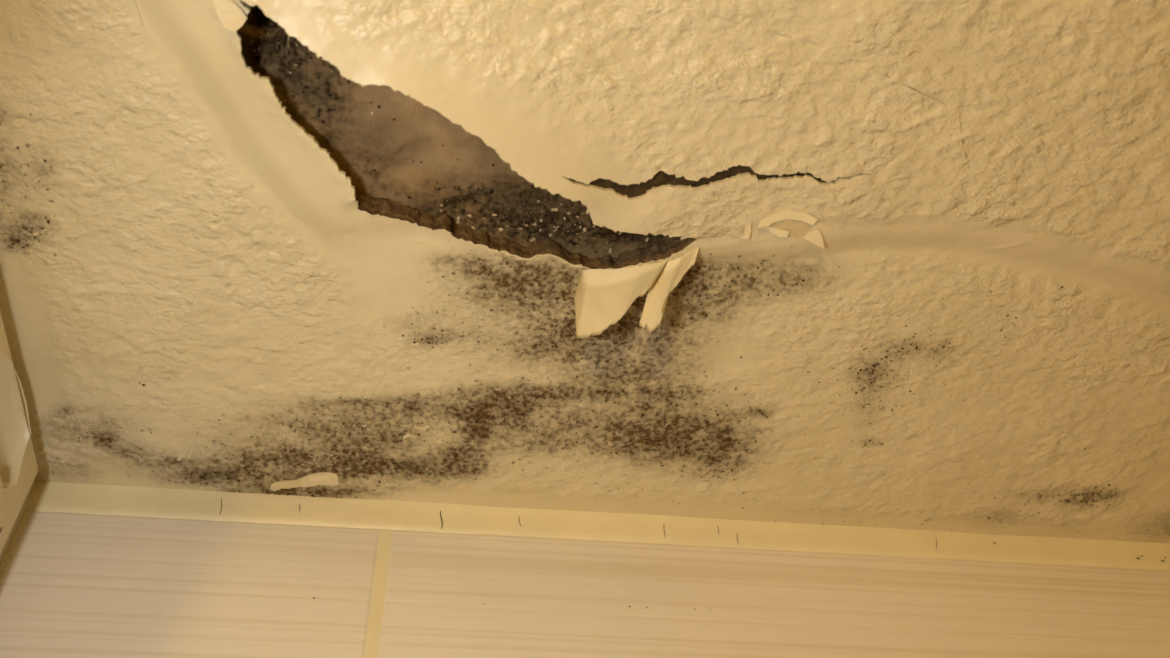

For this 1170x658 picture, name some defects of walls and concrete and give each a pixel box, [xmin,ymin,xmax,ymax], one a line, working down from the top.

spalling [213,0,699,338]
crack [569,165,863,198]
damp [9,217,50,249]
peeling [737,210,824,249]
mould [199,256,812,498]
mould [92,433,139,456]